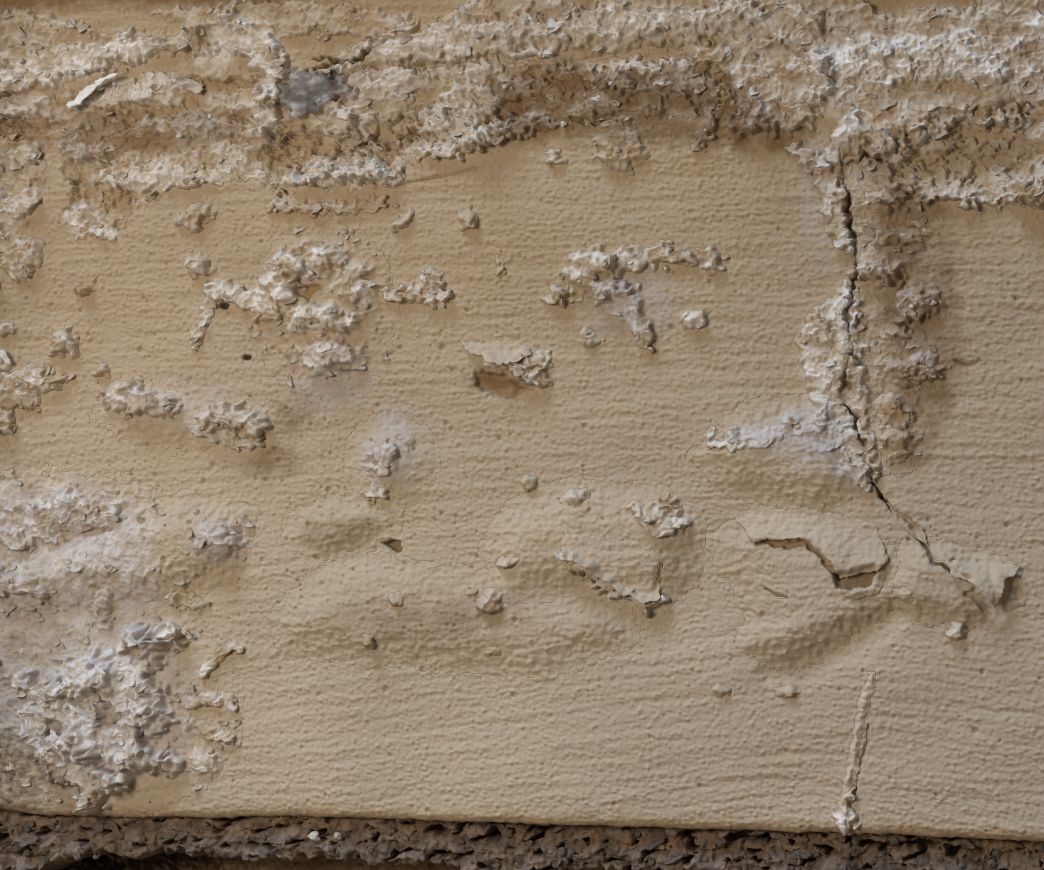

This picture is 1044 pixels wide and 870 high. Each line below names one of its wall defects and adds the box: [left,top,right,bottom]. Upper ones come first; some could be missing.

spalling [0,53,722,254]
spalling [839,118,1044,478]
peeling [461,340,532,365]
crack [835,146,971,583]
crack [953,357,984,369]
peeling [561,529,663,604]
crack [763,586,788,599]
efflorescence [0,464,262,817]
leakage [59,852,205,870]
spalling [0,810,1044,870]